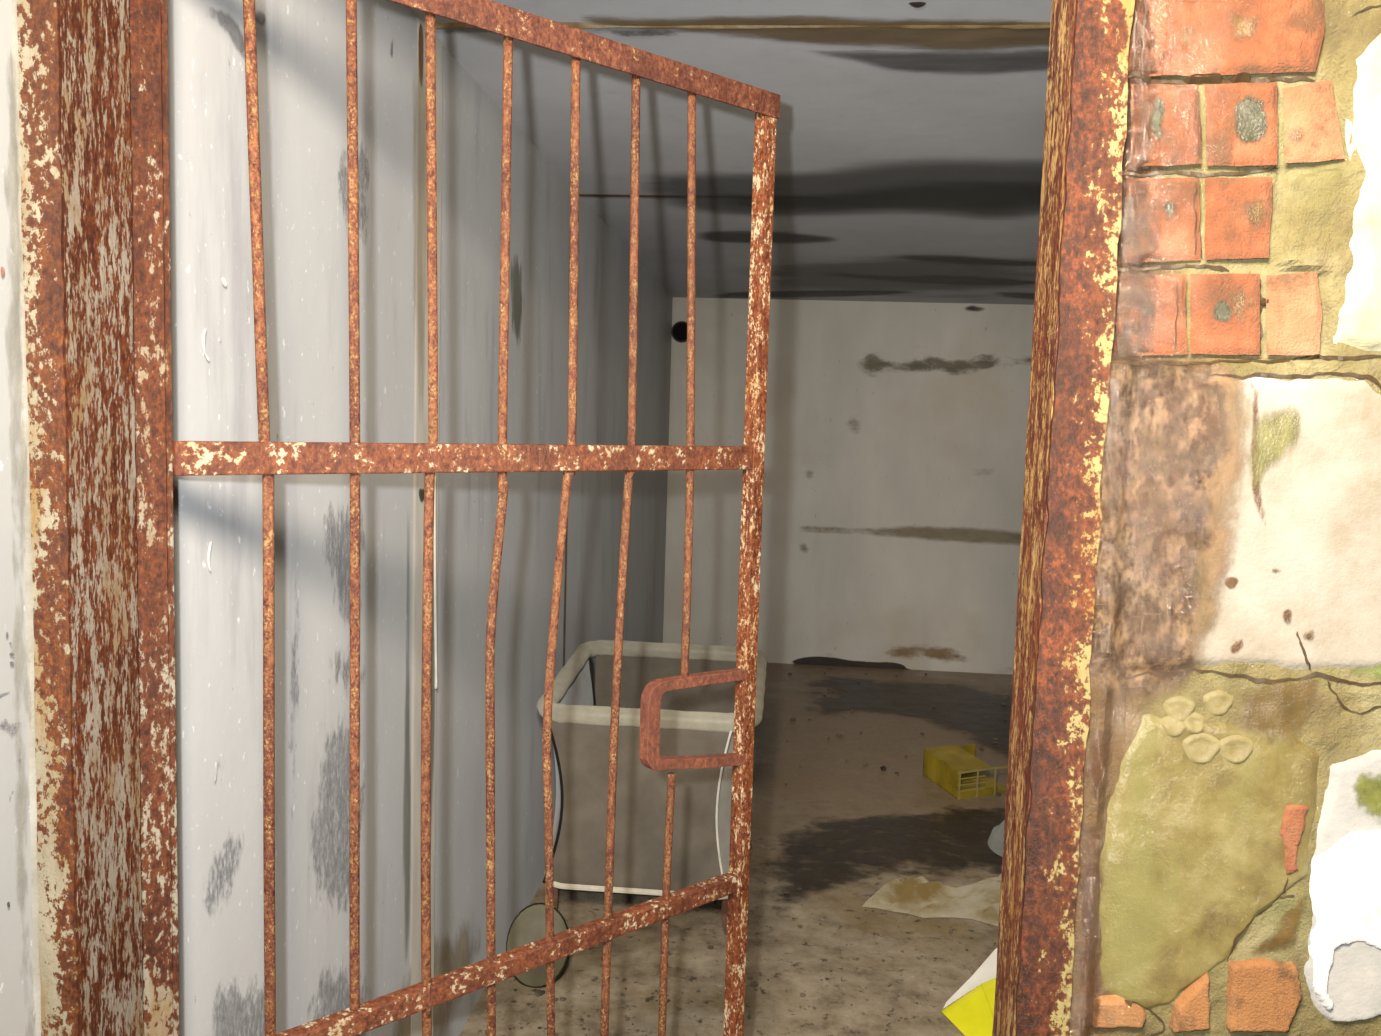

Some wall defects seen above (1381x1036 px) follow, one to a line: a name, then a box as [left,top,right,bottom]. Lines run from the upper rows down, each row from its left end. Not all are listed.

water stain [662,177,753,213]
water stain [773,165,1043,215]
spalling [1114,0,1345,356]
water stain [704,232,751,242]
water stain [772,233,830,243]
water stain [770,256,1037,299]
water stain [865,355,994,372]
crack [1124,631,1381,714]
water stain [312,728,362,905]
peeling [1169,750,1381,1033]
corrosion [1081,827,1102,1036]
crack [1125,999,1165,1036]